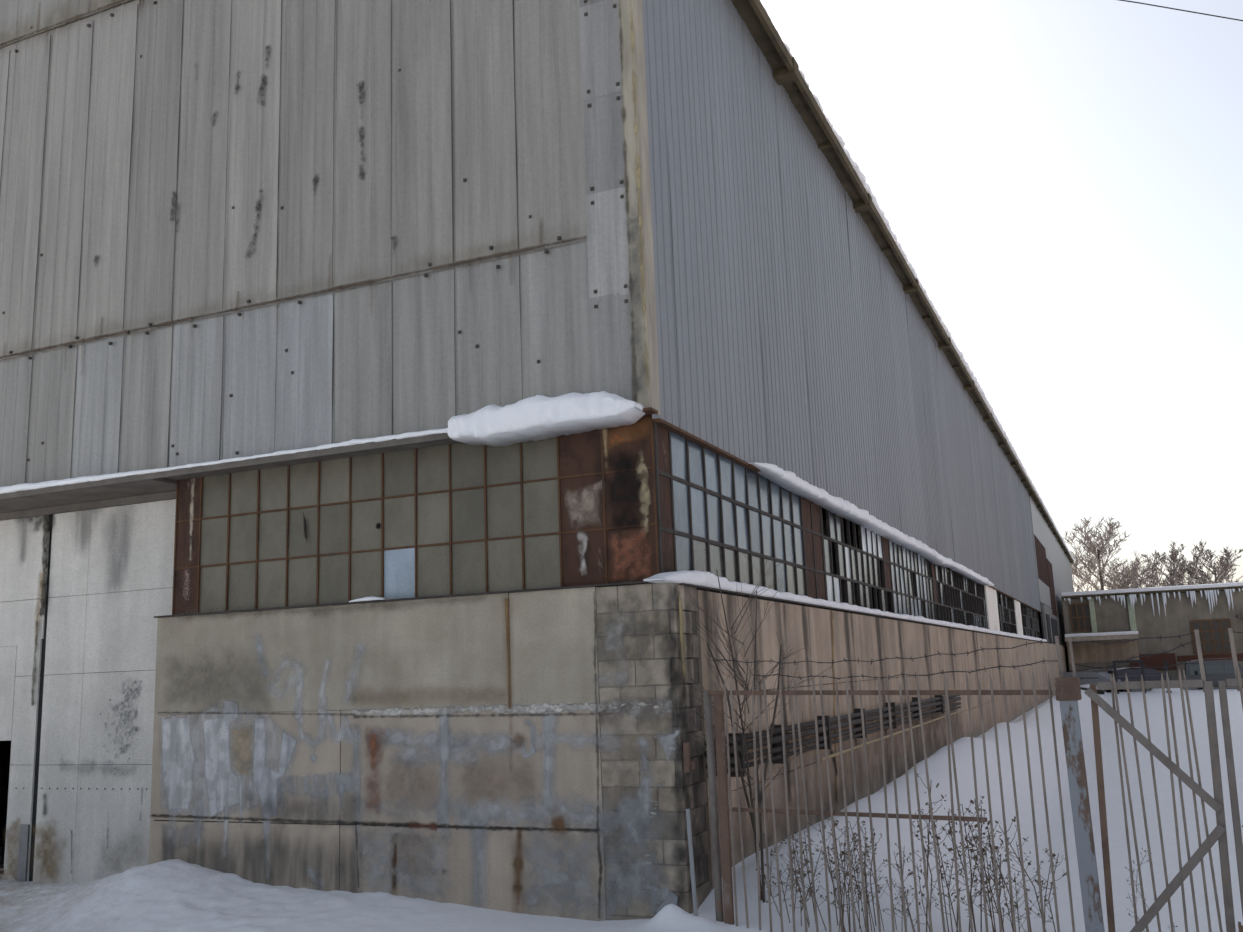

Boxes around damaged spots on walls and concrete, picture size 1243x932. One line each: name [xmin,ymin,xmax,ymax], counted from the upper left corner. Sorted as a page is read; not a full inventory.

peeling [567,420,650,578]
leakage [164,843,285,885]